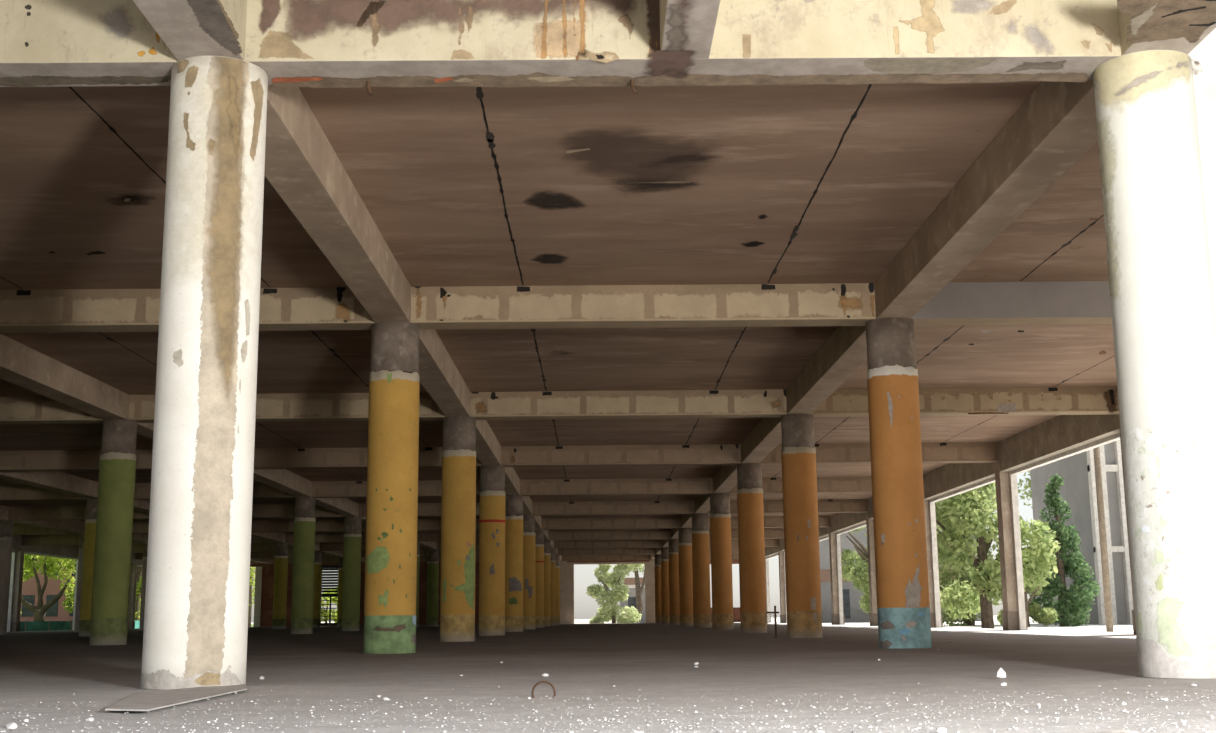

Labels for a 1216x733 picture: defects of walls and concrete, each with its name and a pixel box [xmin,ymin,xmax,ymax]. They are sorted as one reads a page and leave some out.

spalling [0,59,199,95]
leakage [259,0,694,78]
peeling [1117,0,1216,44]
crack [476,87,530,292]
leakage [528,192,583,209]
leakage [566,133,702,192]
crack [761,84,872,290]
leakage [533,254,566,263]
peeling [140,0,1112,689]
peeling [1124,426,1216,678]